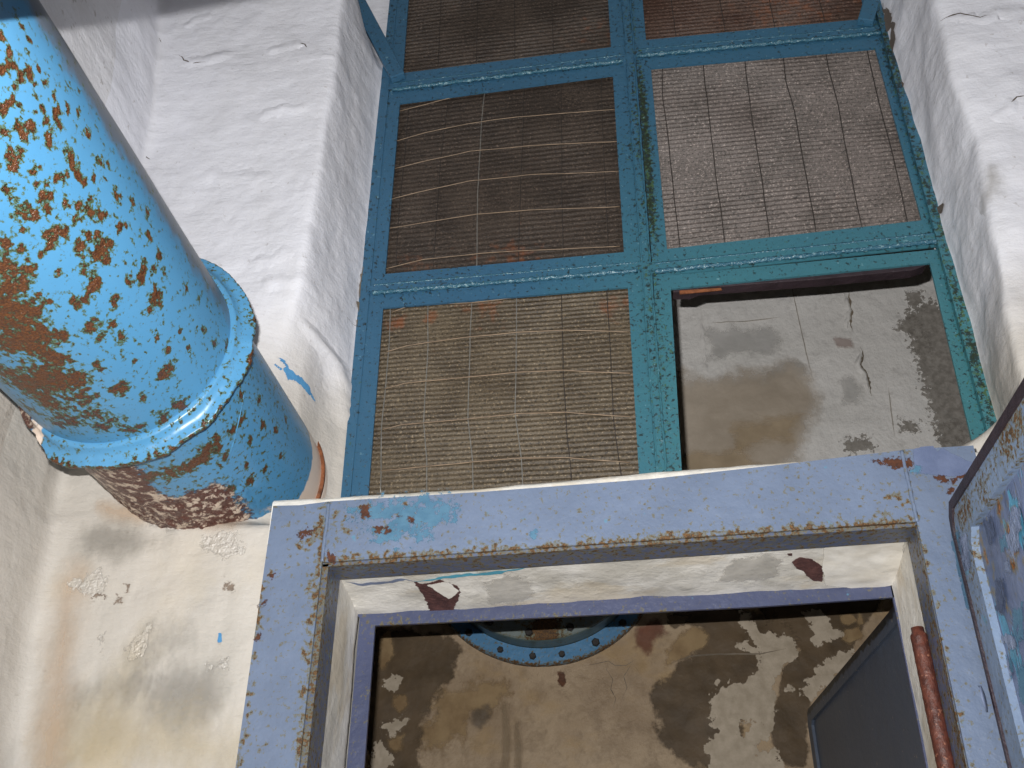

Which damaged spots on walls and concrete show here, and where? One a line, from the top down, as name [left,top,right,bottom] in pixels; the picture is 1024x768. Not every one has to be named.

leakage [892,290,935,357]
crack [848,295,895,436]
leakage [897,415,923,433]
leakage [934,418,970,446]
rust [873,456,914,471]
peeling [345,491,461,551]
spalling [414,580,461,611]
leakage [650,599,880,768]